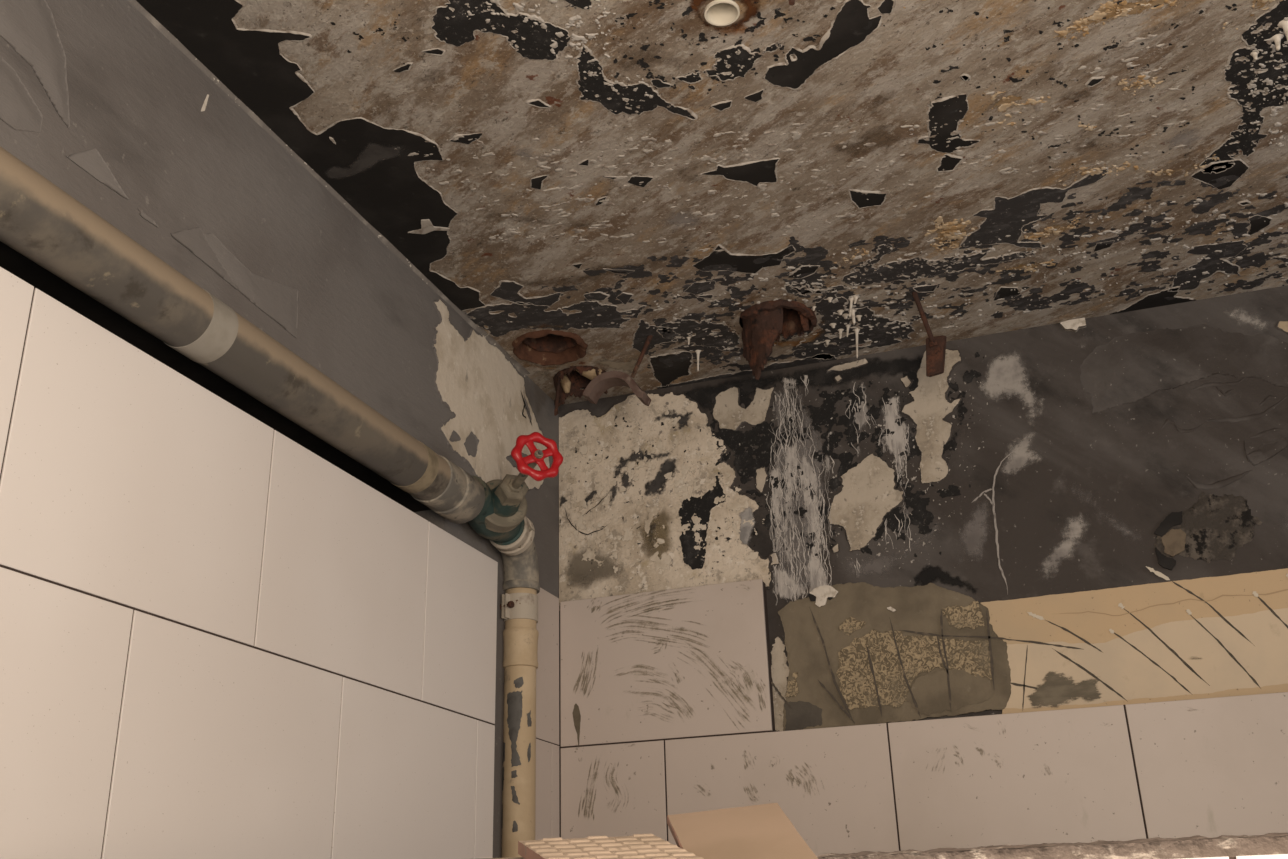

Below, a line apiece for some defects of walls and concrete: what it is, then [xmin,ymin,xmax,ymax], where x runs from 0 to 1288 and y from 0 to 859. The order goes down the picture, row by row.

rust [690,0,759,33]
peeling [1191,0,1288,190]
peeling [1111,200,1273,314]
peeling [136,0,1108,611]
peeling [1275,321,1288,334]
water stain [980,356,1042,417]
water stain [585,450,677,506]
water stain [643,375,835,605]
water stain [845,383,919,578]
water stain [569,552,620,587]
water stain [1043,515,1085,573]
crack [1060,589,1288,616]